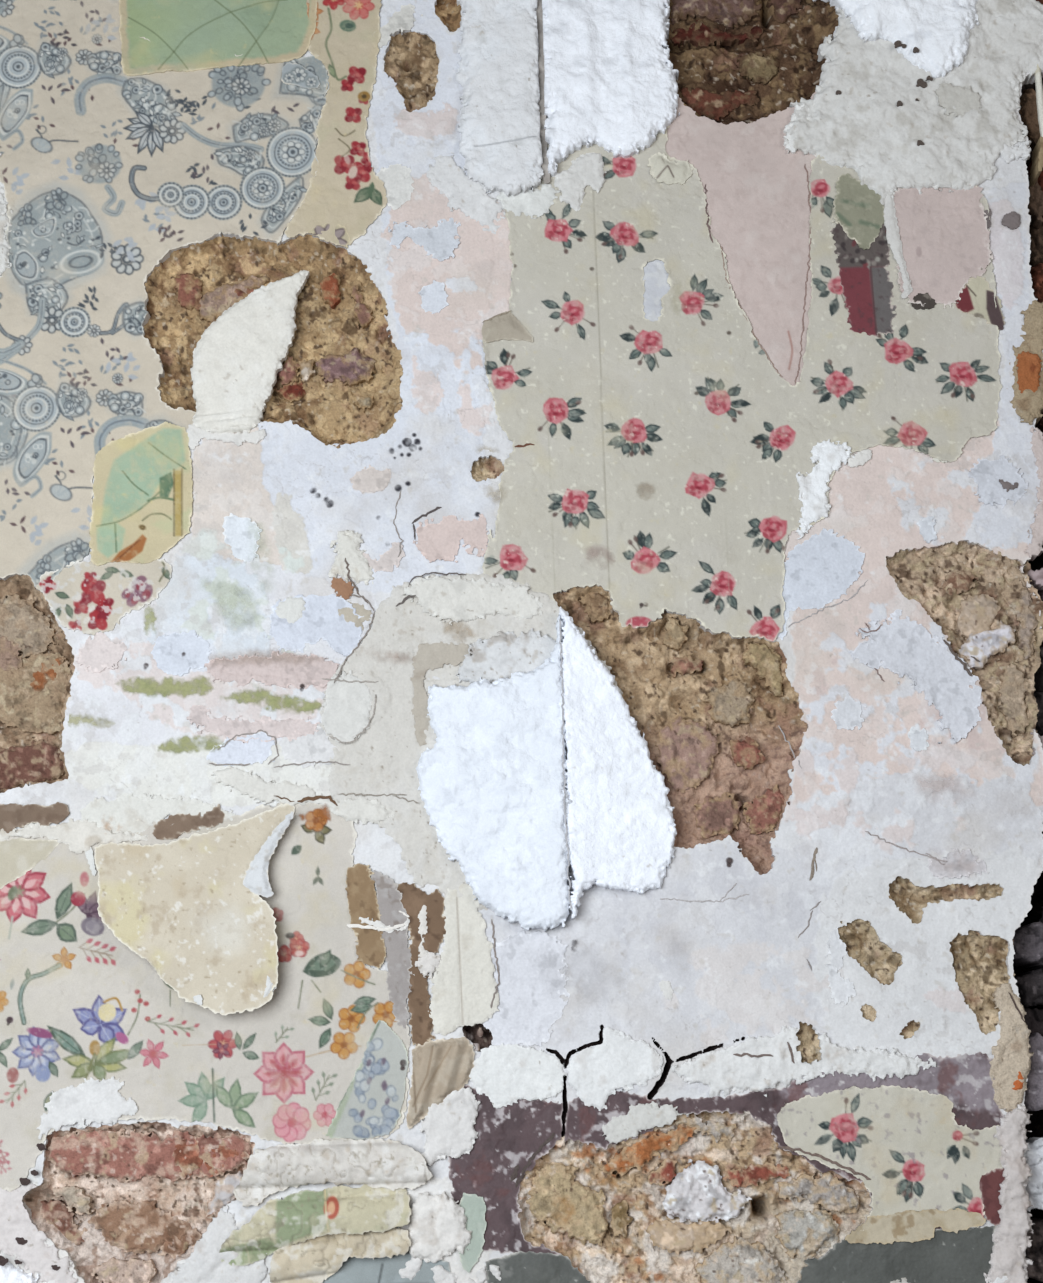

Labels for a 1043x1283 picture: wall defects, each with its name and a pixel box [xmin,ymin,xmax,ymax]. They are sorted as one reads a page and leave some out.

spalling [372,0,461,112]
peeling [665,0,839,386]
spalling [143,234,403,450]
spalling [847,300,1043,766]
spalling [0,574,127,793]
spalling [553,528,866,875]
spalling [838,919,902,985]
spalling [889,849,1003,924]
spalling [0,1121,255,1283]
crack [510,1025,604,1188]
crack [647,1037,795,1100]
spalling [446,930,1035,1283]